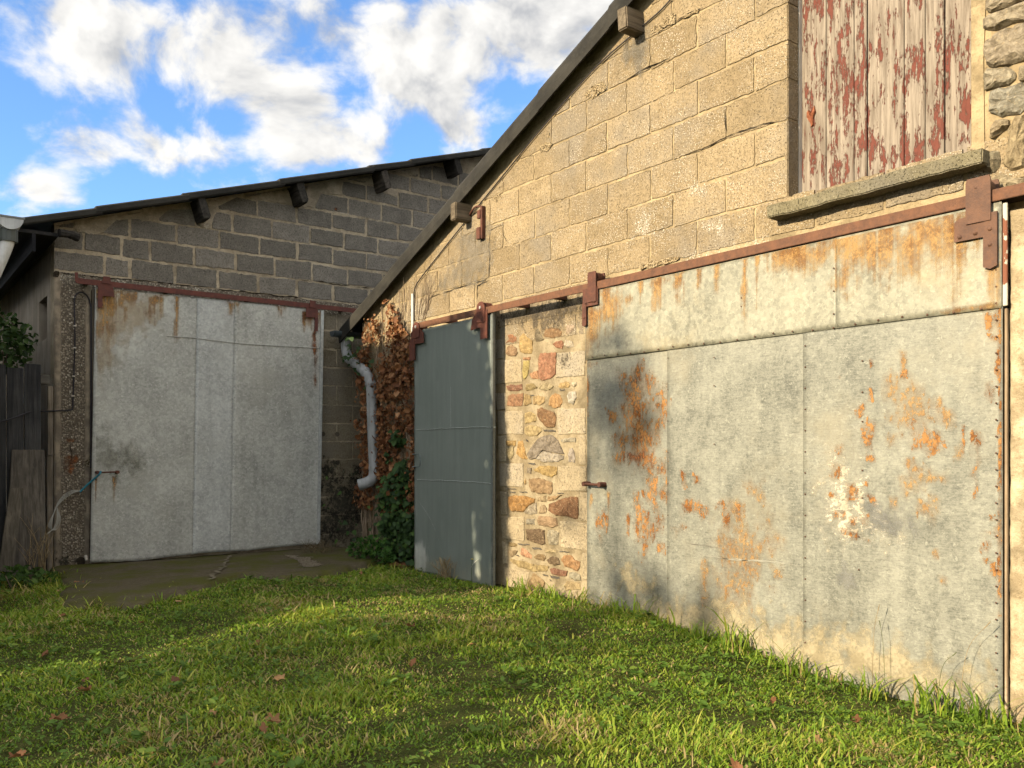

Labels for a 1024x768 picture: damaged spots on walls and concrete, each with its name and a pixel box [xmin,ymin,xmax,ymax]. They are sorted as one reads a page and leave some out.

rust [741,214,977,303]
rust [96,289,179,336]
rust [302,311,321,386]
rust [588,277,662,340]
rust [605,358,671,563]
rust [854,388,874,461]
rust [886,352,981,518]
rust [957,304,1002,598]
rust [681,470,784,613]
rust [834,481,876,542]